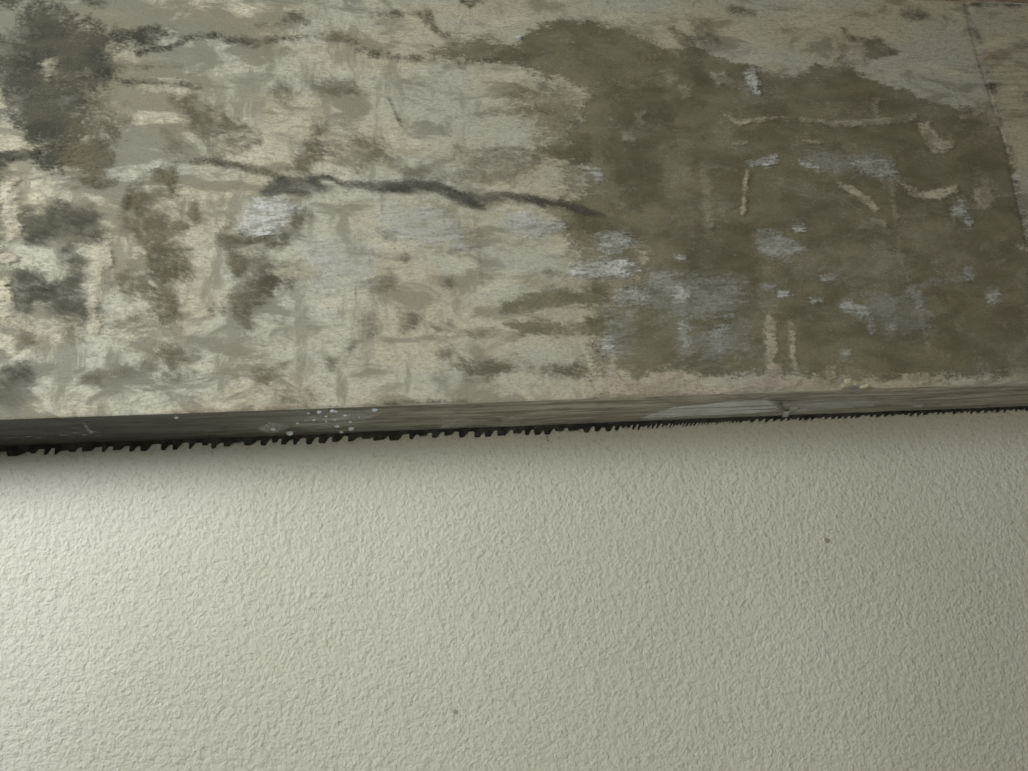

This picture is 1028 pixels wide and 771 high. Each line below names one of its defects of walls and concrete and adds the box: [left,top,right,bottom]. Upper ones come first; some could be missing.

damp [0,0,192,187]
damp [11,247,90,318]
damp [15,199,102,243]
damp [114,190,199,324]
damp [150,168,177,198]
damp [208,193,320,329]
crack [122,157,594,214]
damp [417,11,1028,382]